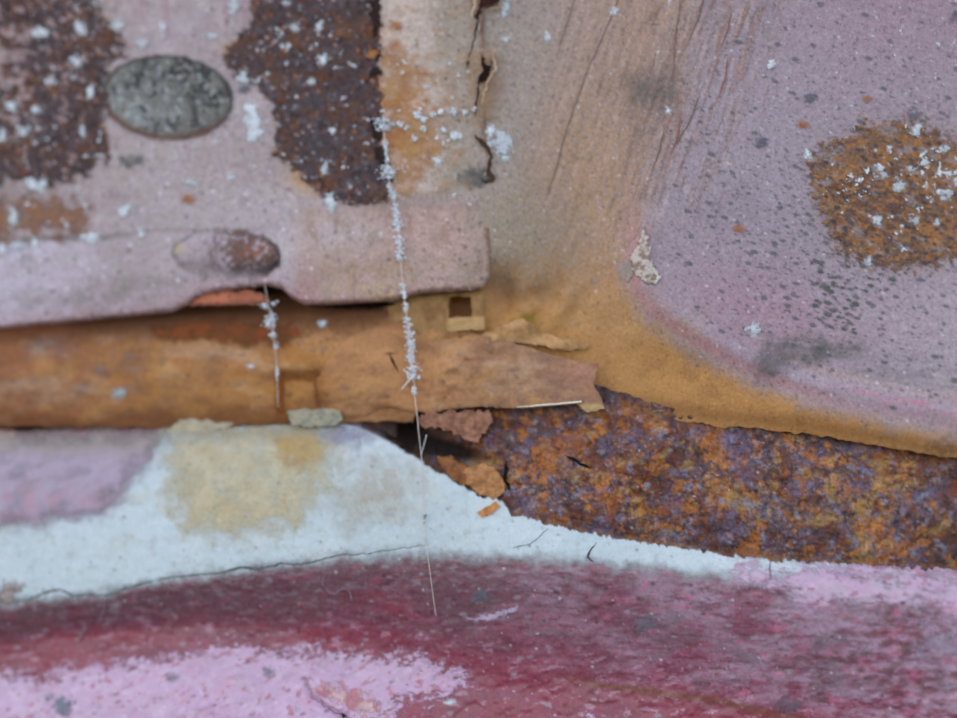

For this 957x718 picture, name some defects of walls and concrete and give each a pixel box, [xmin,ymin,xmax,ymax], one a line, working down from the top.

rust [0,0,129,246]
rust [151,319,300,347]
rust [275,370,321,413]
rust [222,0,436,207]
peeling [617,226,661,285]
rust [806,117,957,275]
crack [1,545,426,603]
peeling [0,408,957,664]
rust [350,384,957,571]
crack [307,686,347,718]